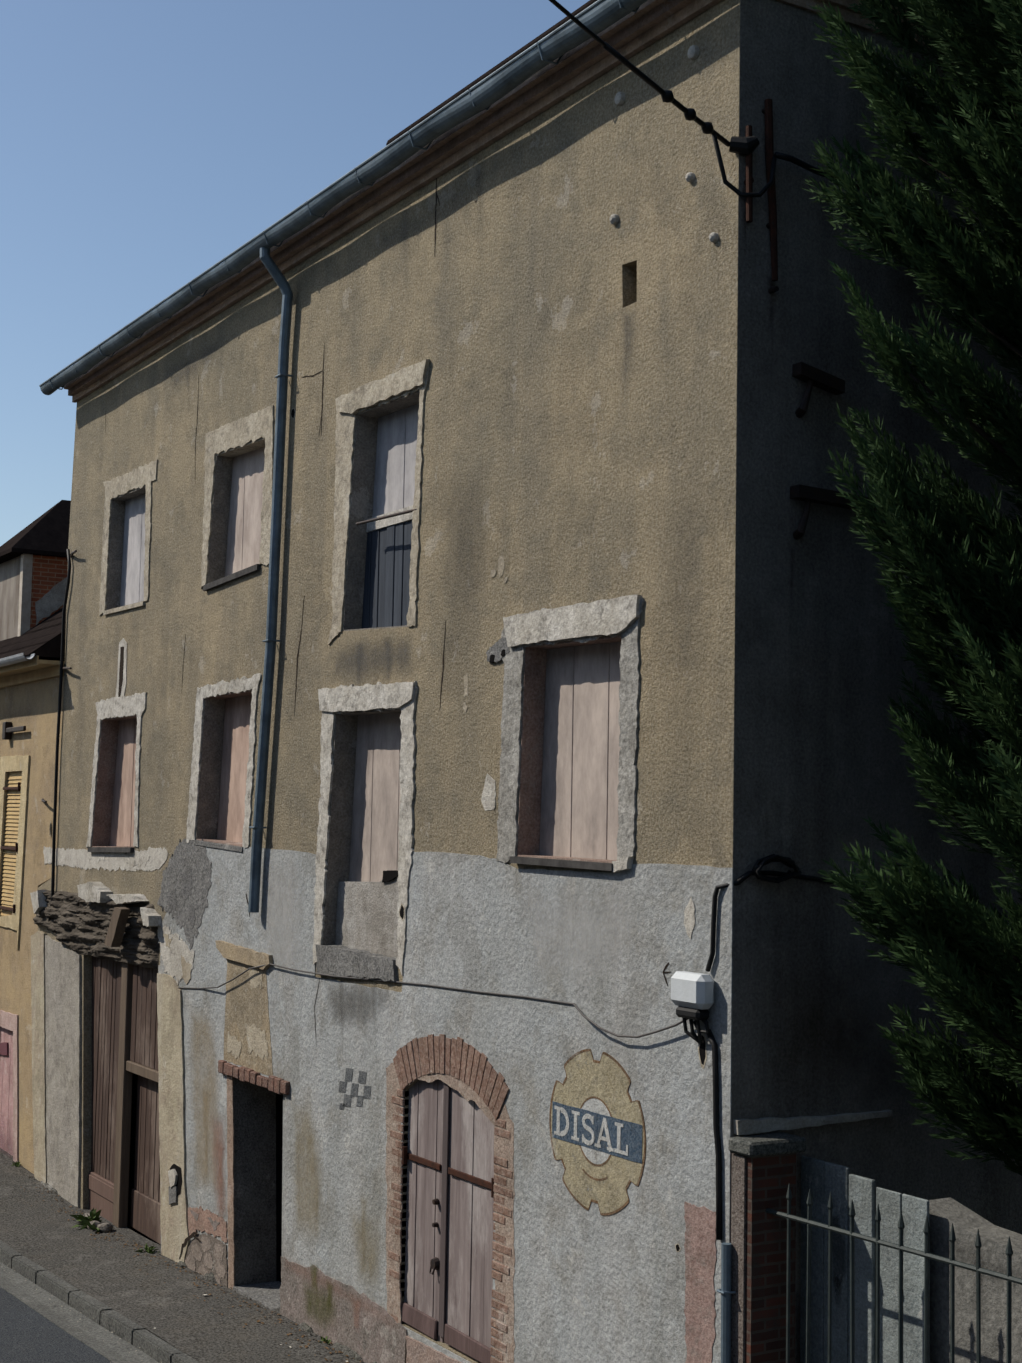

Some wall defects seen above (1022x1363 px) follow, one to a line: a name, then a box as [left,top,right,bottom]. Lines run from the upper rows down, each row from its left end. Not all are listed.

flaking render [43,821,213,985]
peeling [675,1201,717,1363]